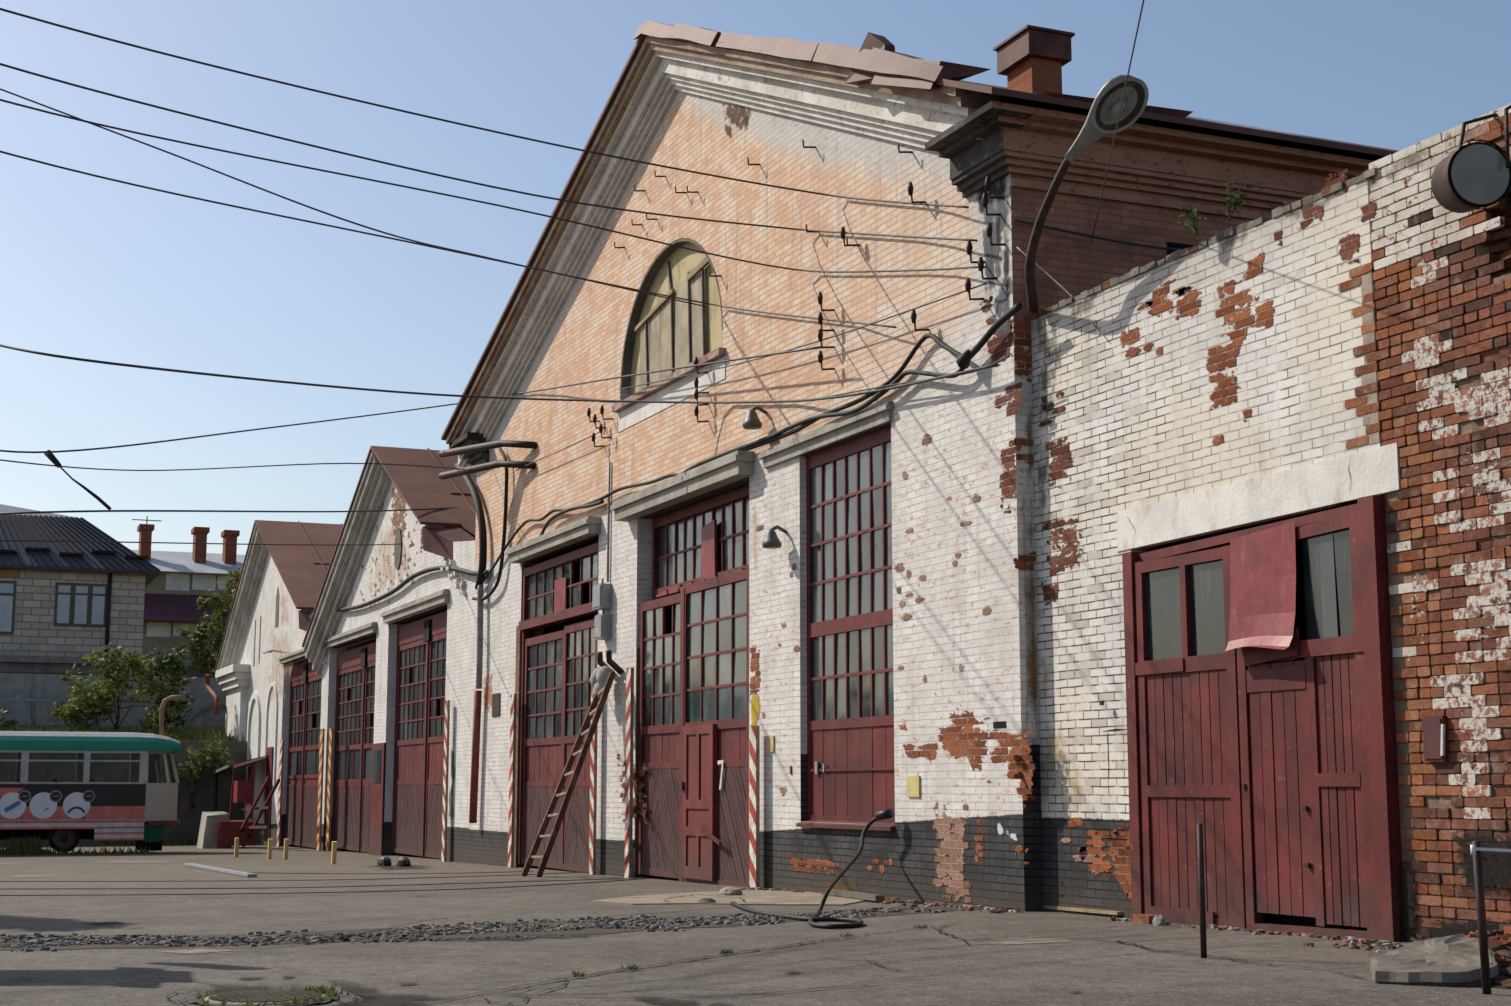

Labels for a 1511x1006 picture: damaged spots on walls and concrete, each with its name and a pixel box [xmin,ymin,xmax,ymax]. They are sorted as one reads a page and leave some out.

spalling [1464,113,1511,160]
peeling [1120,169,1348,422]
peeling [1013,518,1085,606]
peeling [1338,186,1511,941]
peeling [898,709,1036,807]
peeling [930,797,985,905]
peeling [1060,816,1132,899]
crack [395,921,1364,1006]